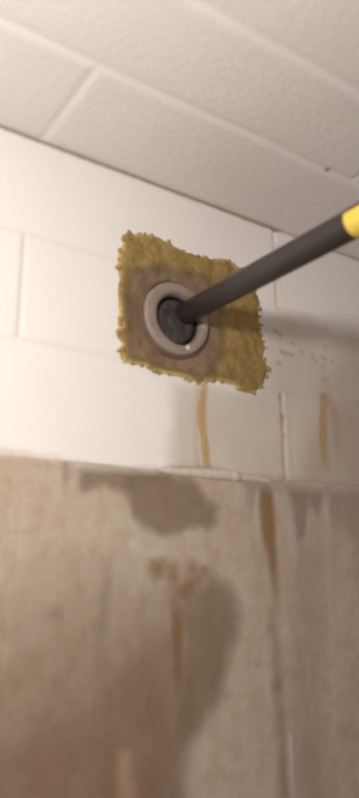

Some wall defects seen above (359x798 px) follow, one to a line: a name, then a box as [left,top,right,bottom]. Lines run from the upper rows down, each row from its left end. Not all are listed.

rust [199,384,208,466]
damp [84,470,214,532]
rust [262,483,274,561]